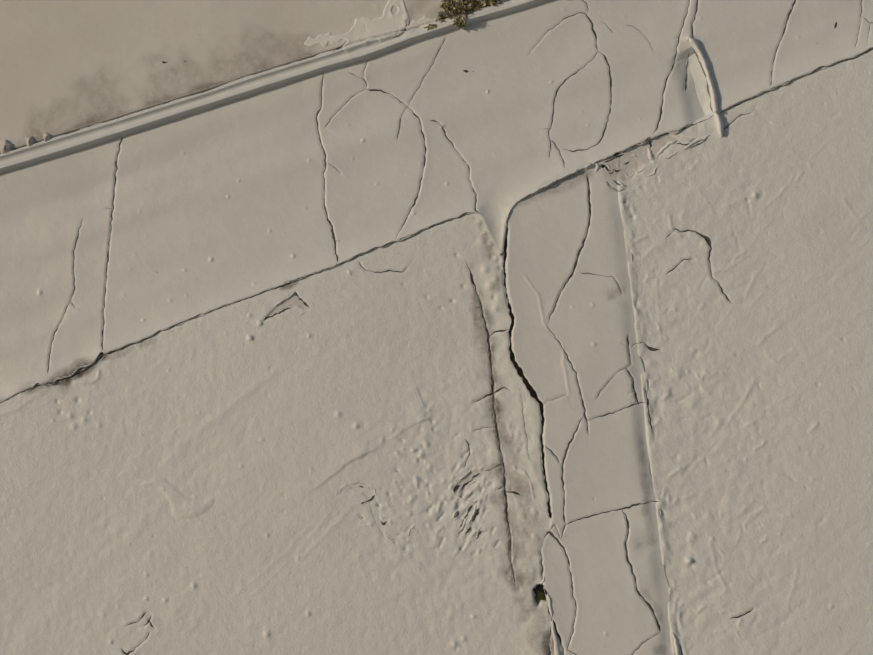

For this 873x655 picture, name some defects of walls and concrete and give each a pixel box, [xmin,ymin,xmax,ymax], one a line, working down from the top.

peeling [304,0,438,53]
spalling [595,135,709,187]
crack [0,36,480,403]
spalling [259,292,310,326]
crack [464,0,873,655]
crack [122,612,154,655]